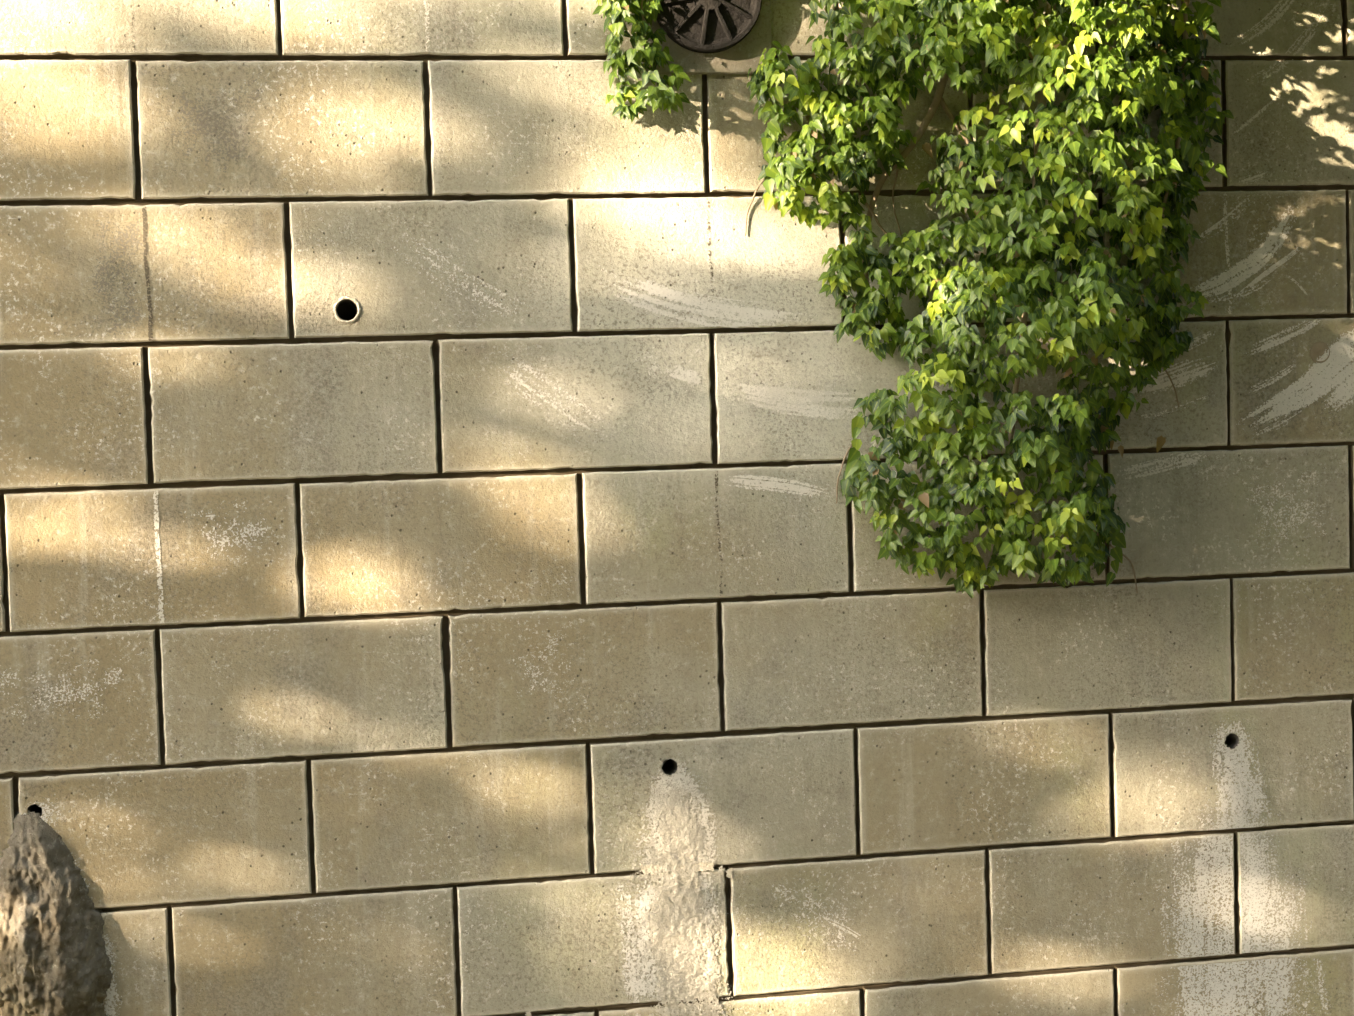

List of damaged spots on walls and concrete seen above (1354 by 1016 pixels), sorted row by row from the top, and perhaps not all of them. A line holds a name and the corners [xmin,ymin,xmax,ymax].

crack [142,206,153,341]
damp [612,758,735,1016]
damp [1144,715,1329,1016]